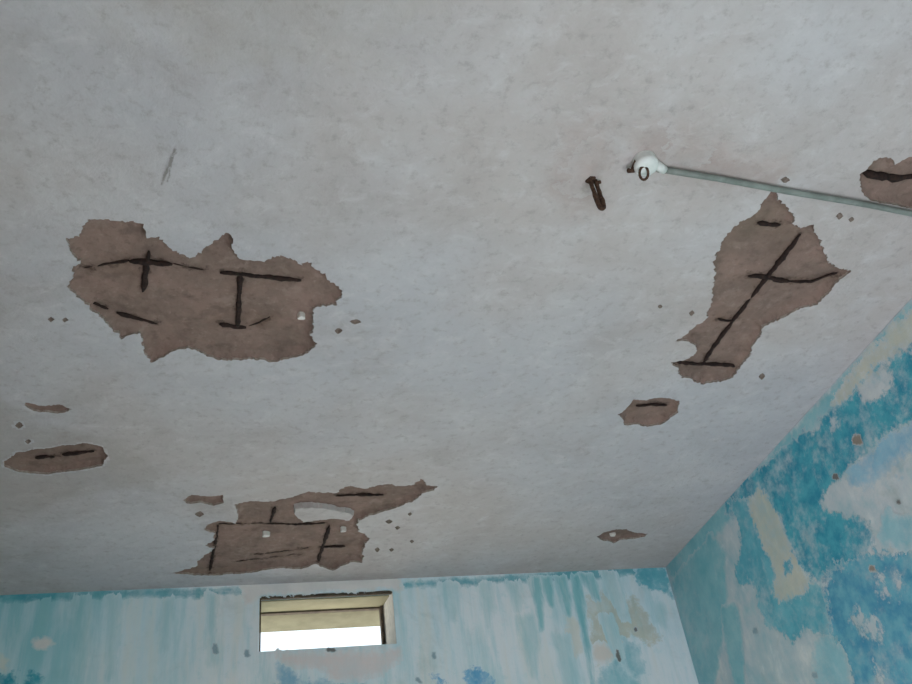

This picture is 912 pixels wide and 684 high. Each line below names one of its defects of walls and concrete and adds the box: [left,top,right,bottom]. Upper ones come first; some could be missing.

rust [538,96,801,224]
spalling [859,157,912,209]
spalling [66,219,342,363]
spalling [671,192,851,385]
spalling [25,403,71,414]
spalling [618,398,680,427]
spalling [3,439,108,475]
spalling [175,479,438,576]
spalling [597,529,646,544]